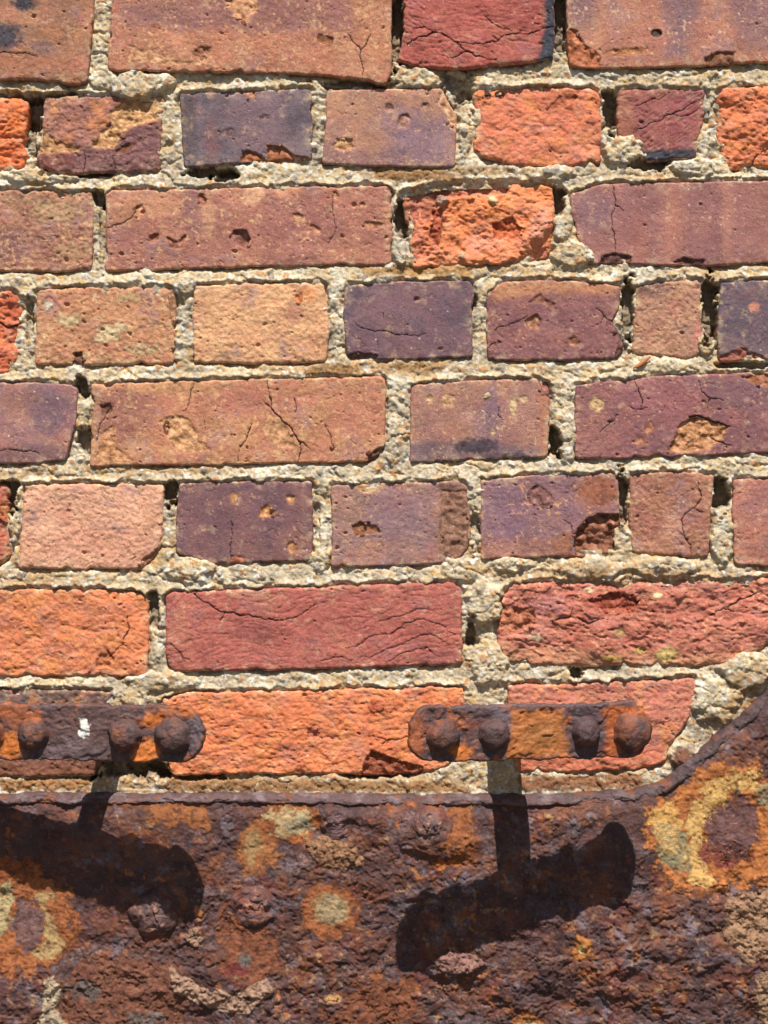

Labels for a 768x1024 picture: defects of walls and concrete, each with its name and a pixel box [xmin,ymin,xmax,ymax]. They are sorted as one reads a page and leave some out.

crack [407,18,550,60]
crack [239,380,304,462]
spalling [667,417,727,453]
spalling [571,514,619,556]
crack [320,608,449,661]
corrosion [0,763,96,791]
corrosion [102,776,481,877]
corrosion [640,747,768,1024]
corrosion [300,884,362,941]
corrosion [0,855,284,1024]
corrosion [434,951,487,975]
corrosion [317,972,428,1024]